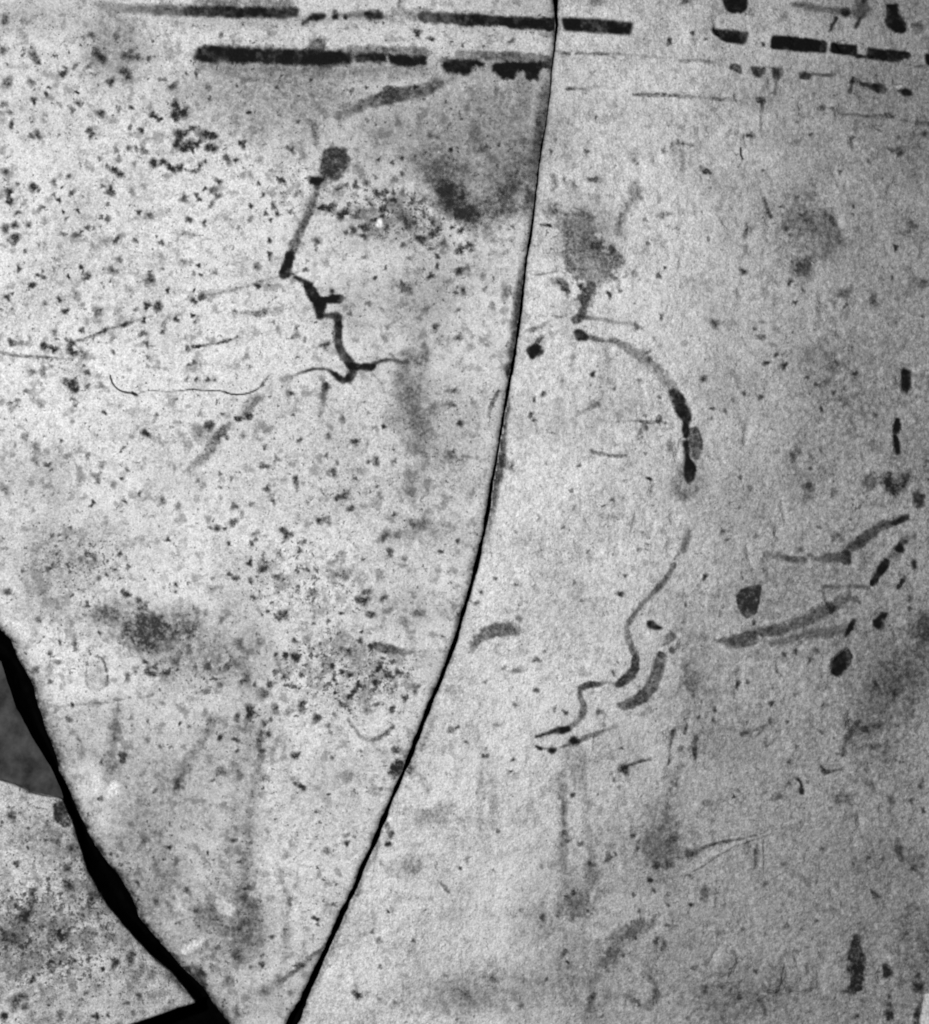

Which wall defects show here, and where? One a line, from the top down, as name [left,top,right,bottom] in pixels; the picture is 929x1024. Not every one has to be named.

crack [0,629,210,1000]
crack [279,0,558,1024]